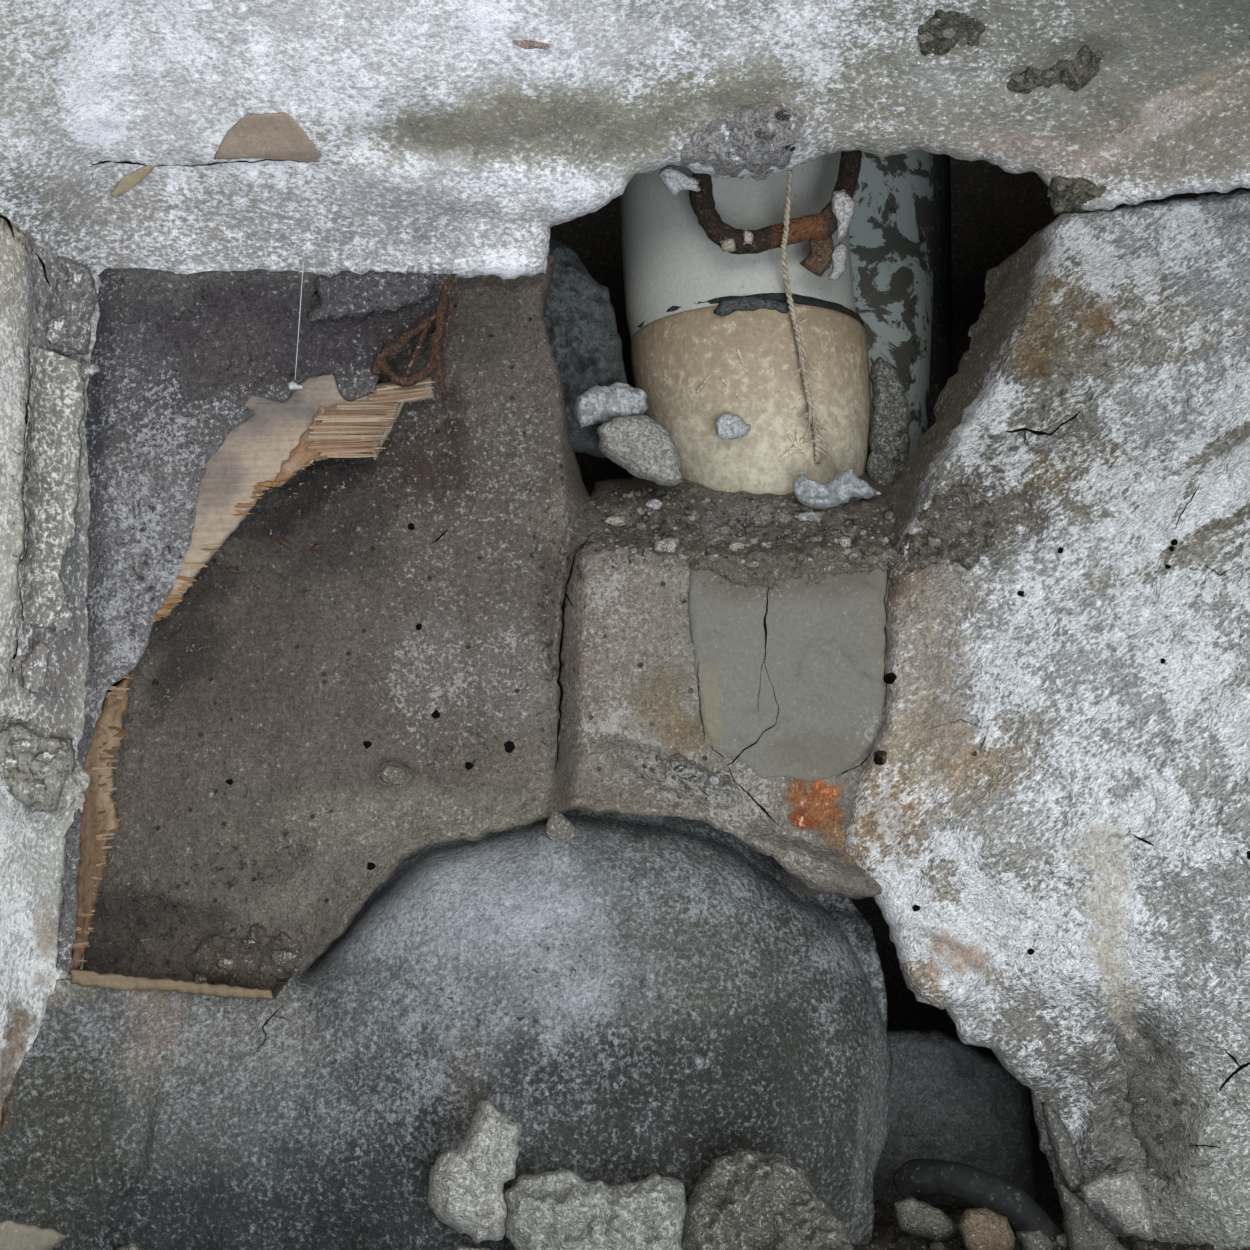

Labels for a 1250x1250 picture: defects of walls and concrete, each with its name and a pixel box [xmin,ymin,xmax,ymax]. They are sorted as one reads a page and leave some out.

spalling [680,107,796,181]
corrosion [689,150,862,281]
flaking render [309,270,438,321]
crack [555,533,593,769]
crack [697,588,779,825]
spalling [504,741,515,753]
corrosion [788,779,852,859]
spalling [184,922,305,993]
crack [1219,1049,1250,1091]